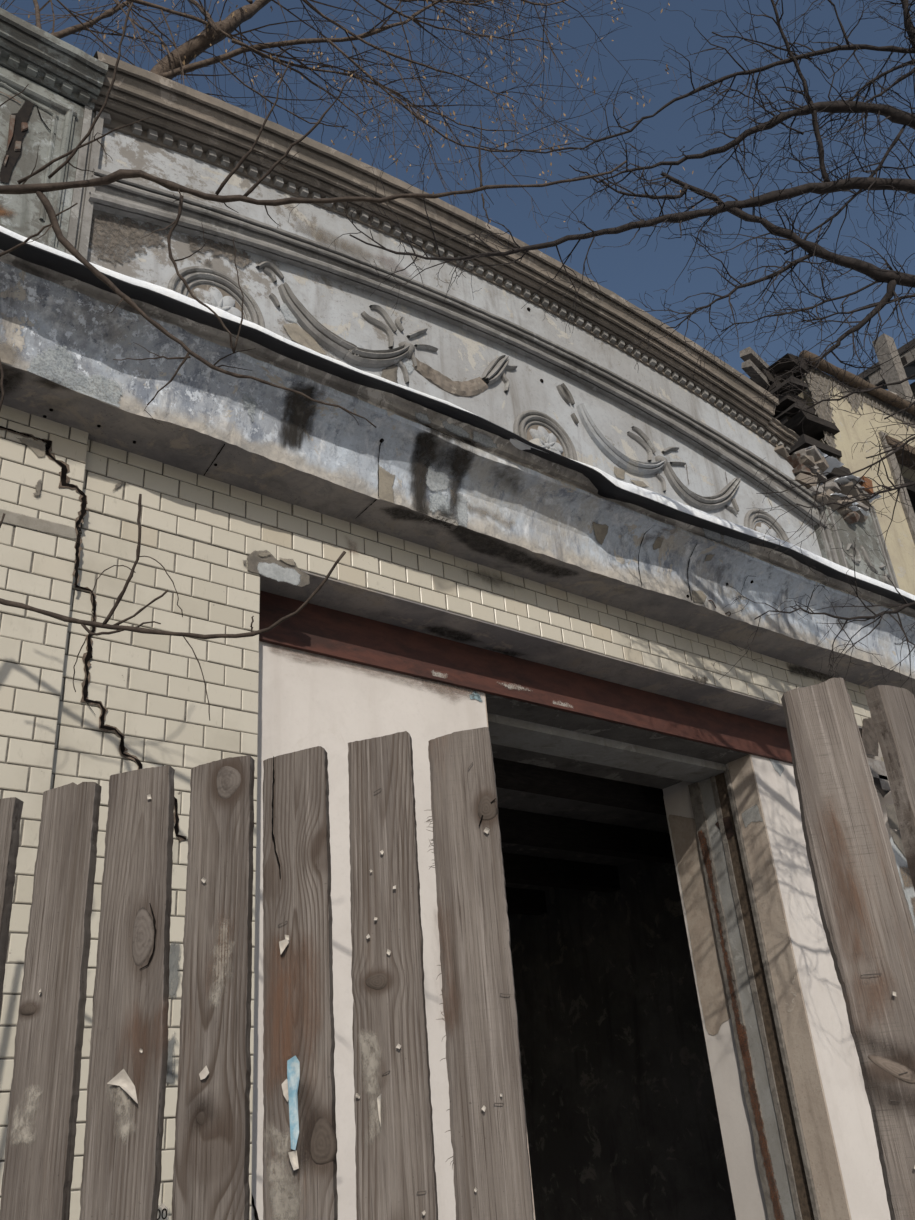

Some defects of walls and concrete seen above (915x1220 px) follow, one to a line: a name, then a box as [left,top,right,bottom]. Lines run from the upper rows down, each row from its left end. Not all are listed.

spalling [0,100,35,183]
water stain [281,385,316,448]
water stain [384,425,577,576]
spalling [774,445,882,524]
crack [0,426,143,769]
spalling [244,550,310,587]
crack [174,797,186,841]
corrosion [698,831,784,1220]